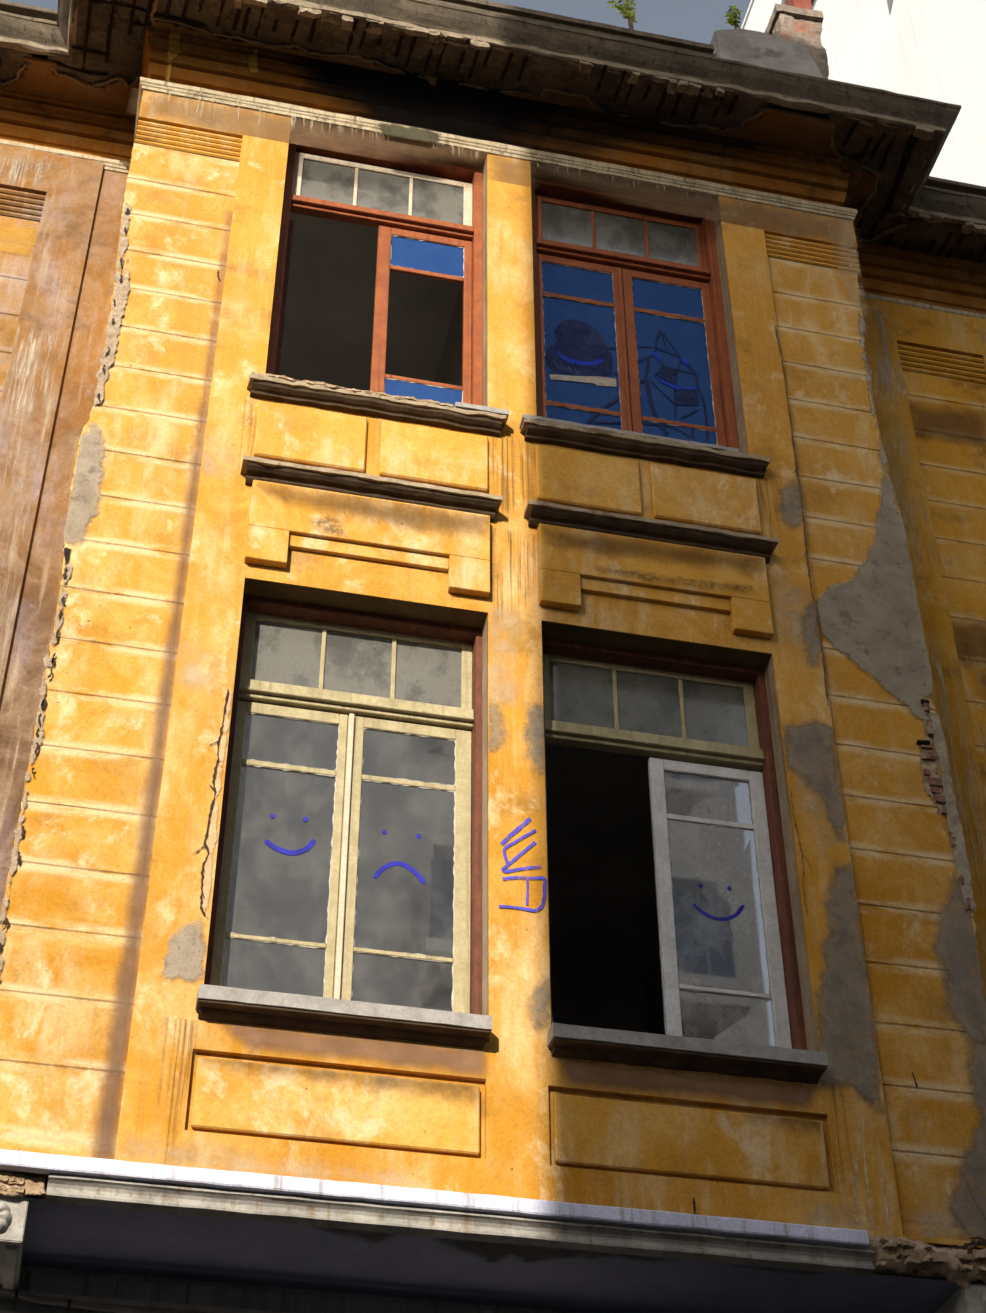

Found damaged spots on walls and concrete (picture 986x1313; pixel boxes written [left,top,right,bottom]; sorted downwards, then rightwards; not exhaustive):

leakage [192,92,381,133]
spalling [94,202,131,405]
flaking render [0,423,105,979]
flaking render [163,689,233,982]
crack [194,689,230,916]
flaking render [785,721,846,841]
flaking render [802,314,986,1241]
spalling [0,1172,46,1198]